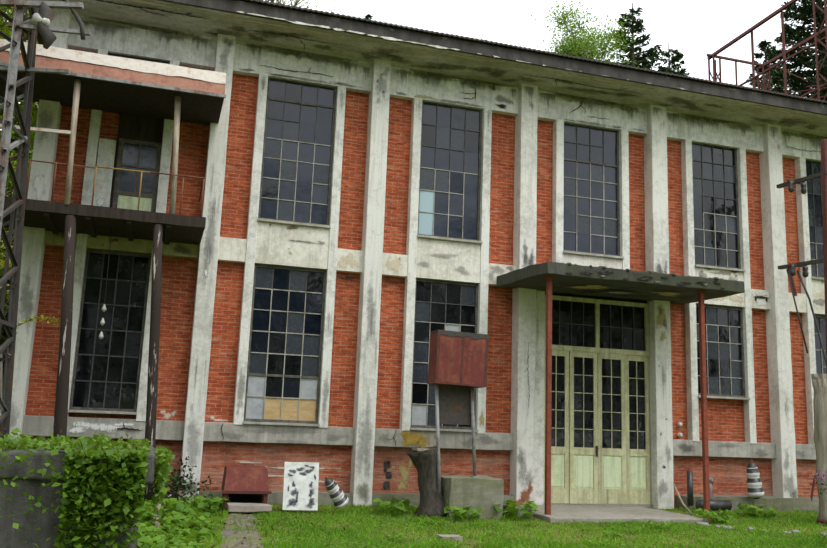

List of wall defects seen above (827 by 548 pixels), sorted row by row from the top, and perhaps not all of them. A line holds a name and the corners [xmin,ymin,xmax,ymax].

crack [97,0,210,20]
leakage [87,17,535,109]
leakage [542,76,648,116]
leakage [654,97,827,149]
peeling [567,270,643,298]
spalling [623,271,743,302]
spalling [752,292,770,306]
peeling [69,421,134,433]